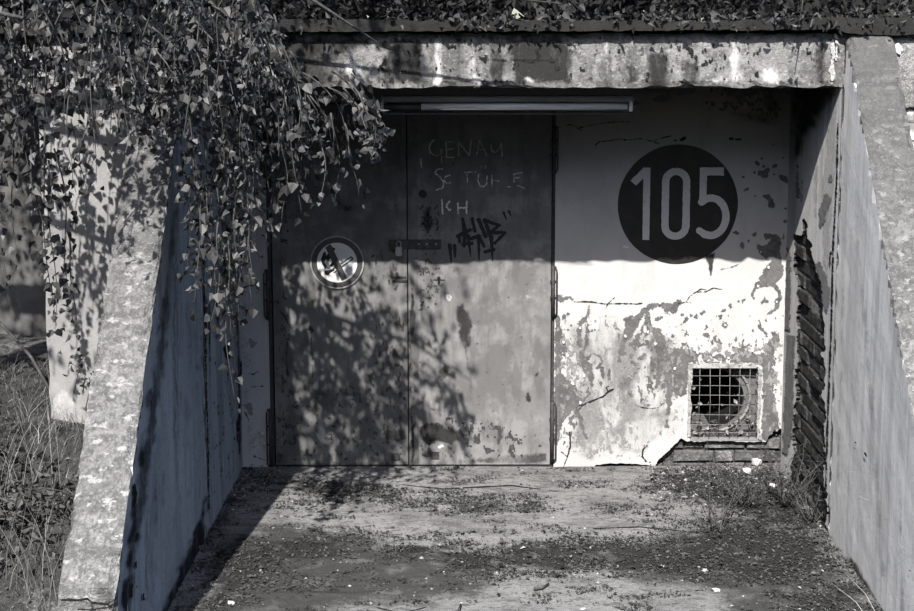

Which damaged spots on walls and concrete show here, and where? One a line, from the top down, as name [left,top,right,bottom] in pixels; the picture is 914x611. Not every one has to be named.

water stain [383,39,422,82]
water stain [433,41,442,85]
water stain [489,36,570,84]
peeling [662,32,788,120]
water stain [729,43,739,90]
water stain [762,68,779,110]
spalling [906,108,914,145]
crack [572,297,642,307]
crack [678,288,722,304]
spalling [553,156,832,531]
water stain [122,227,179,611]
crack [561,386,614,467]